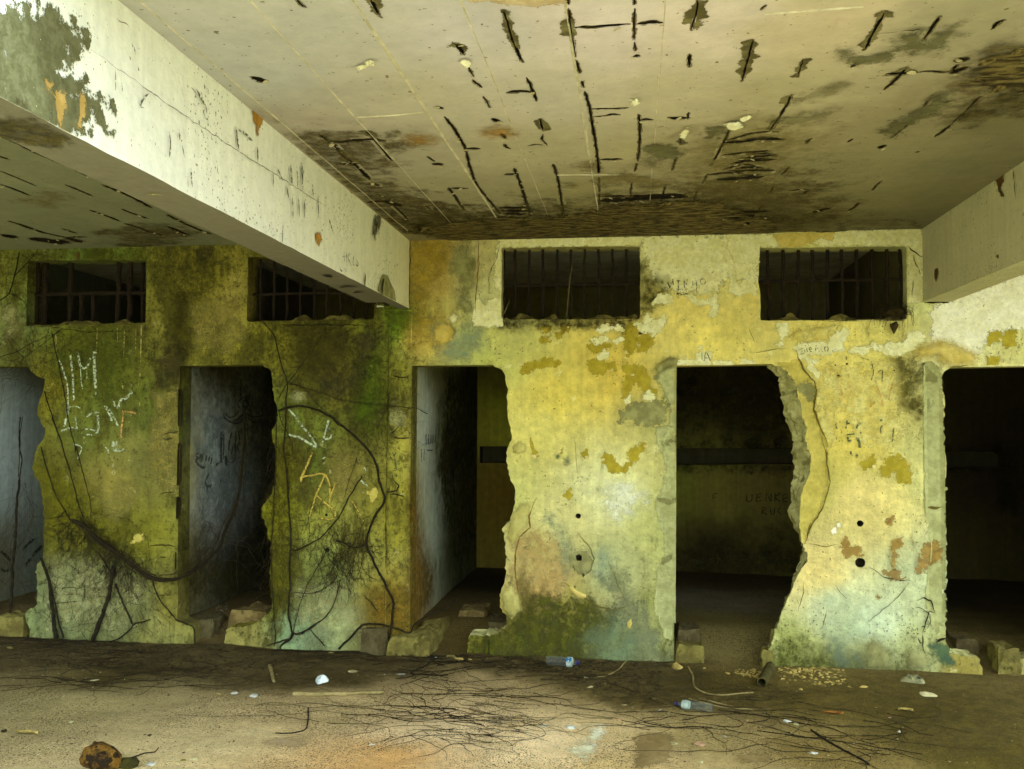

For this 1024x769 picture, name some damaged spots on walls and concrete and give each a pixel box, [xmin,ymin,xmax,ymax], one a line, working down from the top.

peeling [0,0,117,148]
peeling [468,0,583,82]
peeling [682,0,709,30]
crack [88,48,328,209]
corrosion [252,110,263,135]
spalling [714,94,795,182]
spalling [472,261,760,640]
crack [750,332,836,547]
spalling [765,313,948,634]
water stain [48,564,139,631]
corrosion [840,536,864,561]
corrosion [881,538,943,581]